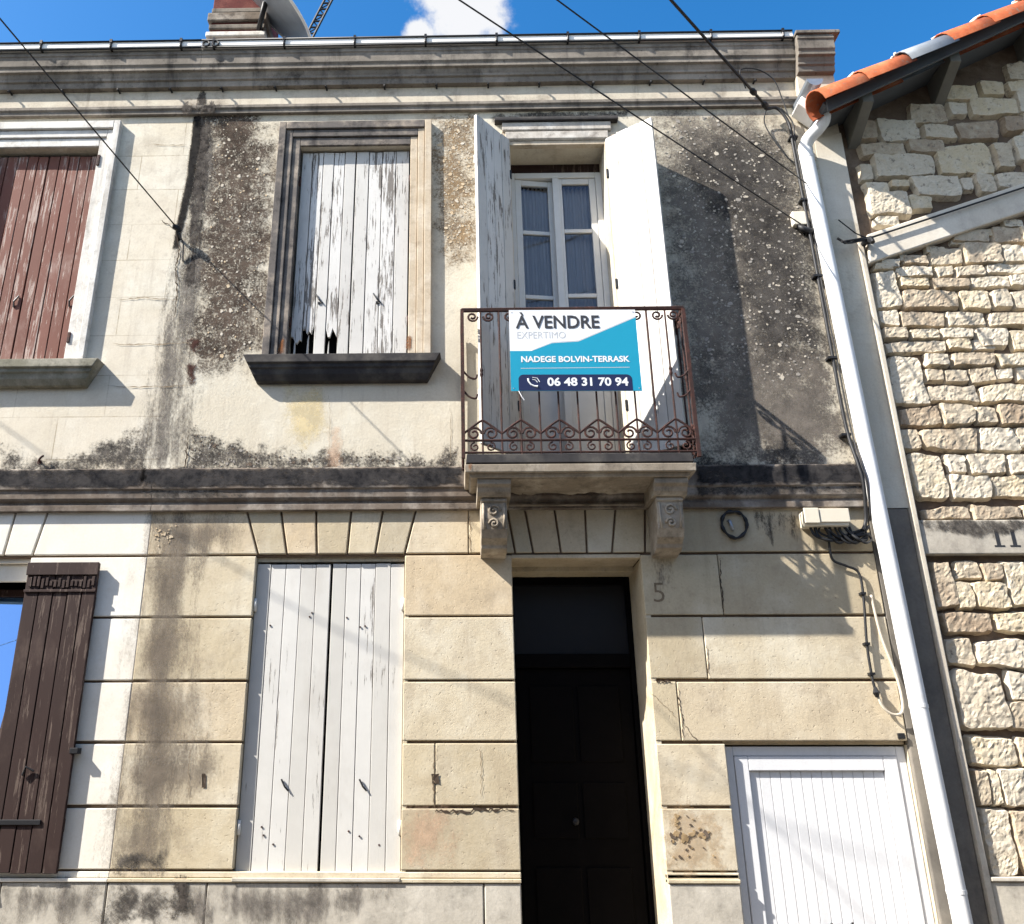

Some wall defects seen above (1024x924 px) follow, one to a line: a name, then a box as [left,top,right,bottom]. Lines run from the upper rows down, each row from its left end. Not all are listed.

damp [0,91,462,499]
damp [695,436,862,496]
damp [100,512,220,924]
crack [654,691,698,742]
spalling [669,814,714,859]
damp [18,883,95,924]
damp [223,883,361,924]